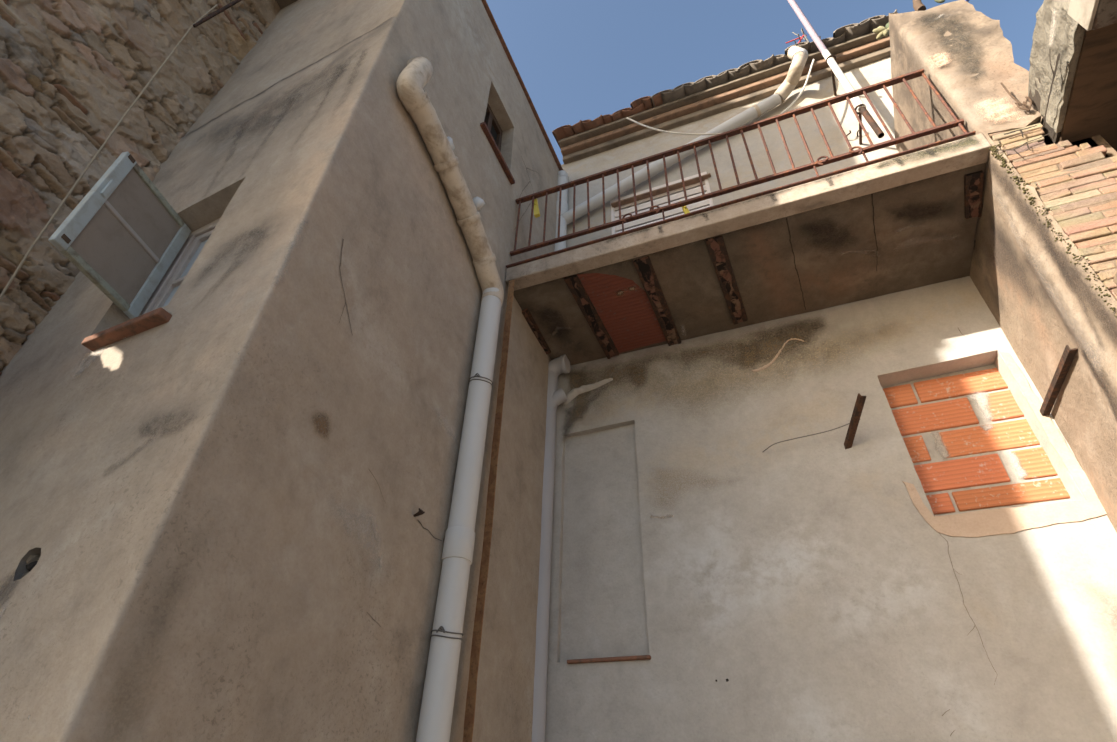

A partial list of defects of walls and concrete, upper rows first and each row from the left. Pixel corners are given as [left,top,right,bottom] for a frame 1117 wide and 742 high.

corrosion [705,236,748,325]
leakage [982,163,1117,413]
leakage [664,325,818,367]
leakage [565,360,650,434]
peeling [902,351,1107,538]
hole [21,555,41,579]